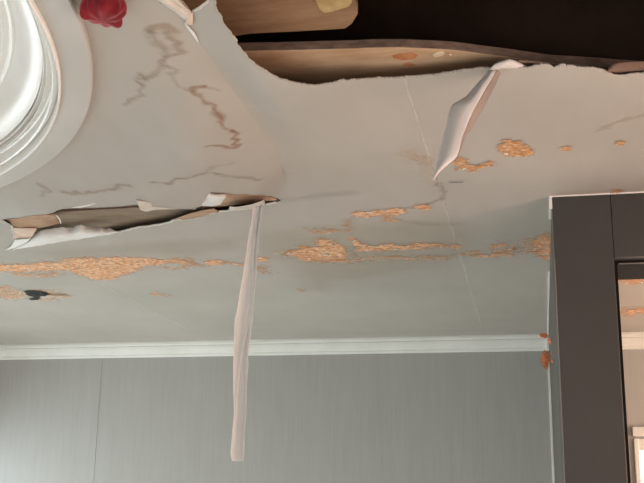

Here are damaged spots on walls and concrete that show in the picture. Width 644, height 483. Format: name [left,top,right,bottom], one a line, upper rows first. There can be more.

peeling [452,140,534,172]
peeling [351,203,431,222]
peeling [282,225,519,264]
peeling [528,233,551,261]
peeling [0,255,195,281]